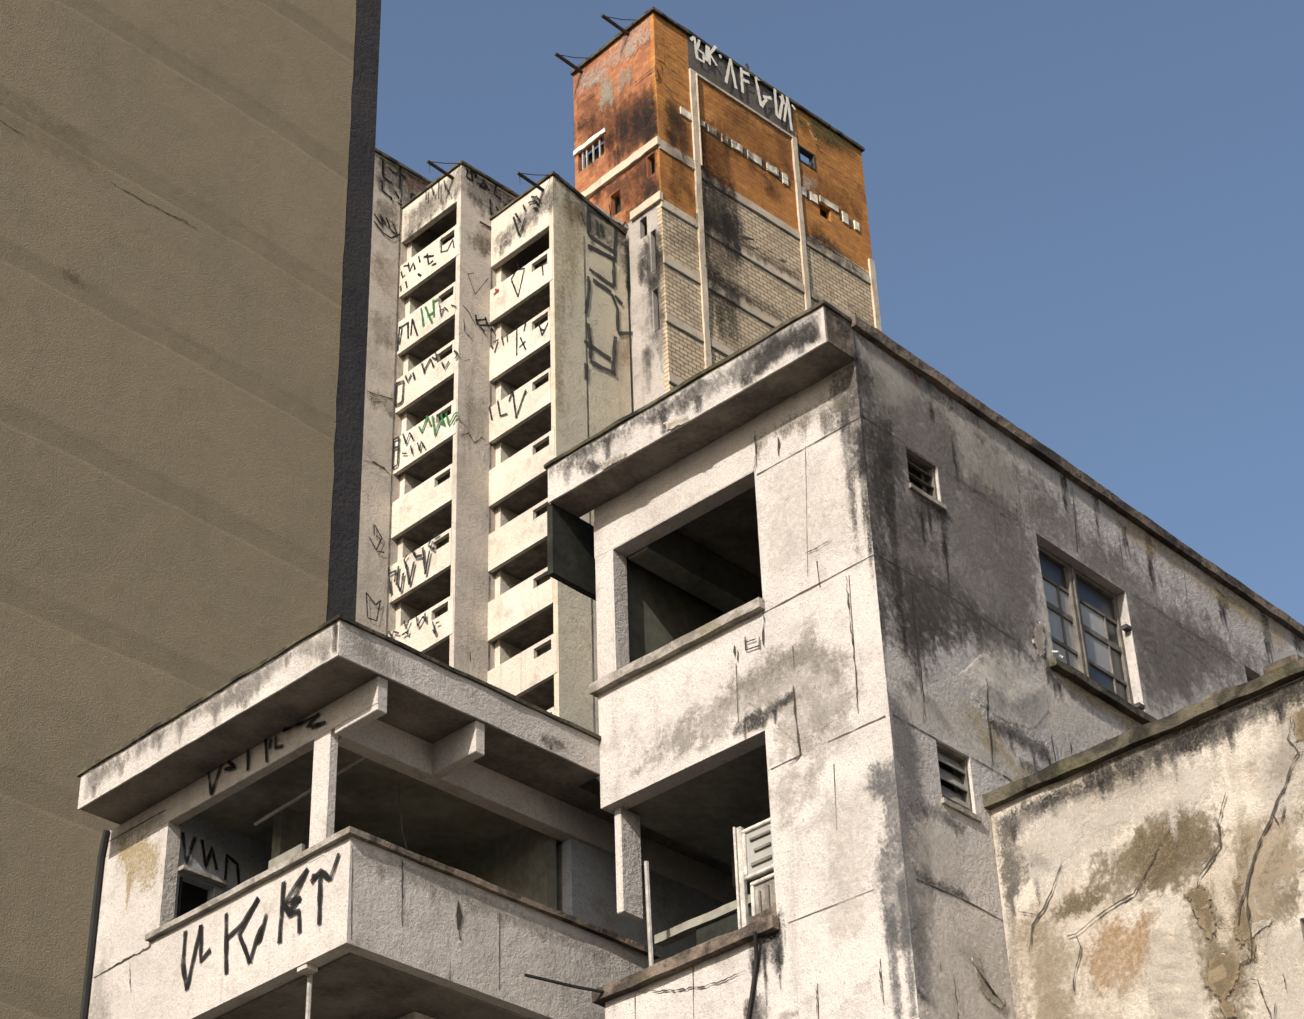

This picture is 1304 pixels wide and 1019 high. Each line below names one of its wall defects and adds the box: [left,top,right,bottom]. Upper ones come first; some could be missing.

damp [592,119,687,164]
crack [113,183,195,228]
damp [696,214,739,340]
damp [913,495,949,575]
damp [734,655,795,739]
damp [866,653,1051,1019]
crack [1019,863,1062,951]
crack [1067,827,1171,1000]
damp [995,677,1304,1019]
crack [1197,793,1226,887]
crack [1236,713,1304,1019]
crack [97,947,149,990]